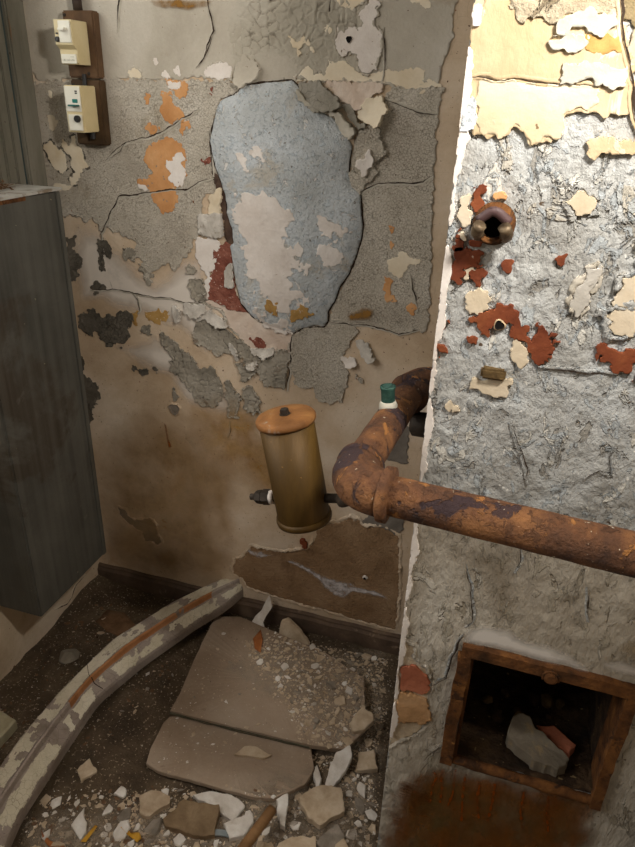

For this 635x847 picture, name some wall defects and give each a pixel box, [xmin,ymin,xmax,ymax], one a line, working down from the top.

crack [195,0,369,71]
crack [382,27,438,115]
crack [464,72,595,86]
crack [616,0,635,126]
crack [106,110,200,162]
crack [101,129,215,240]
peeling [23,0,635,531]
peeling [229,513,635,847]
rust [388,769,584,847]